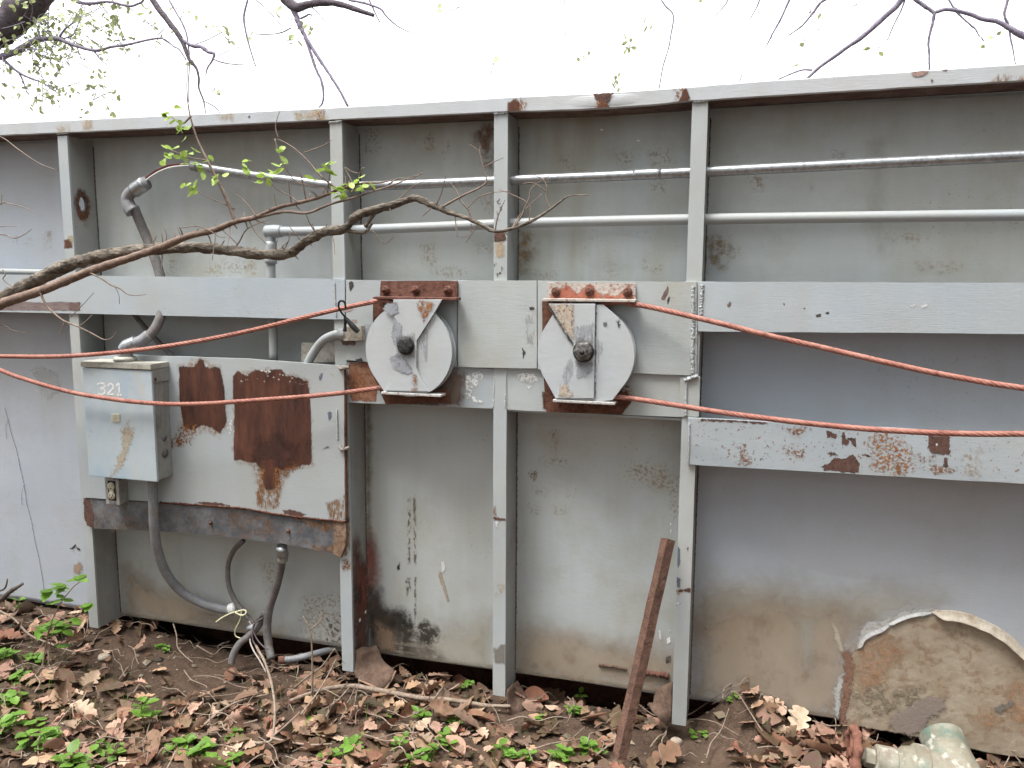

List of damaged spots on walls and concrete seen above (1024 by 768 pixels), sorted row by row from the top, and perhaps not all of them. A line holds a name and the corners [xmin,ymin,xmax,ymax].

corrosion [507,98,526,111]
corrosion [593,92,614,108]
corrosion [75,189,90,221]
peeling [383,303,412,374]
corrosion [550,284,634,340]
corrosion [697,419,966,475]
corrosion [83,498,102,528]
corrosion [171,359,377,650]
damp [367,578,484,662]
peeling [833,607,1024,758]